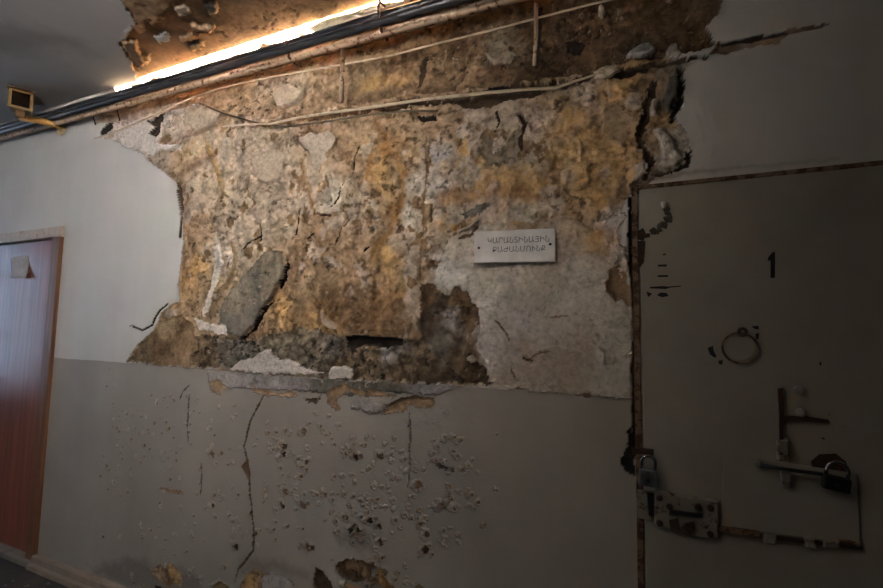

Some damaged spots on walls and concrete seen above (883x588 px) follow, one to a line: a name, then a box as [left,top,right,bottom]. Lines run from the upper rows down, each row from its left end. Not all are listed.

peeling [96,0,830,475]
crack [242,394,265,553]
spalling [314,558,394,588]